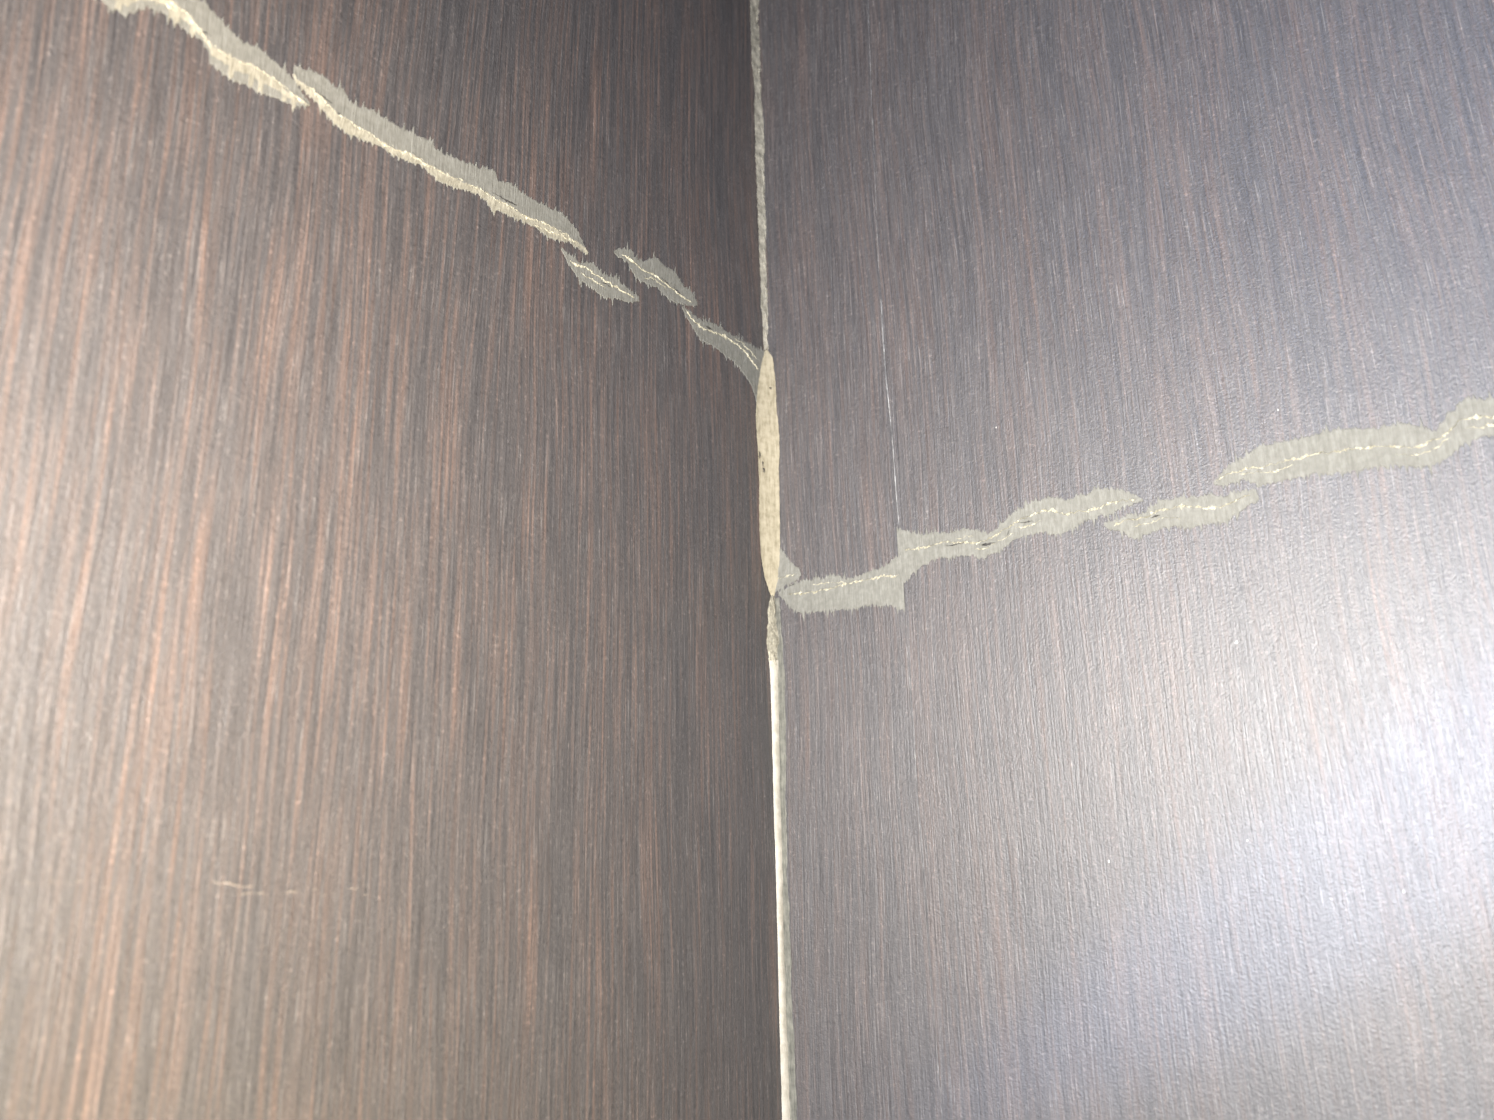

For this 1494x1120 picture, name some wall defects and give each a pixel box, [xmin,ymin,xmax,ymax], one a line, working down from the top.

crack [95,0,765,402]